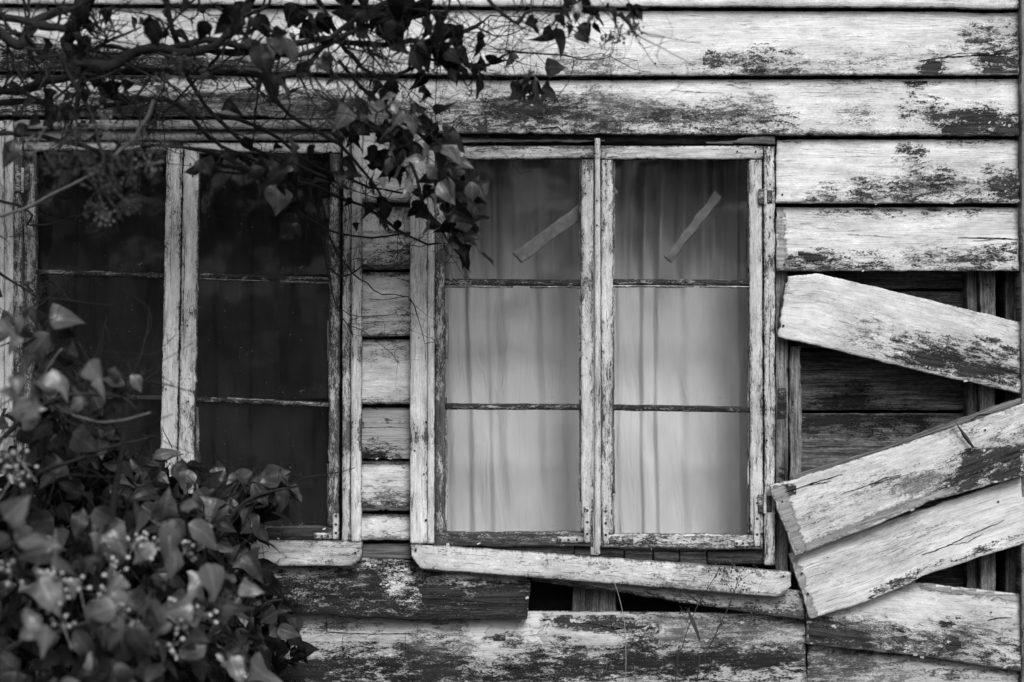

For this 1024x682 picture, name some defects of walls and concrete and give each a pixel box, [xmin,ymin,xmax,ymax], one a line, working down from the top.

peeling [703,43,806,86]
peeling [429,105,804,148]
peeling [804,19,1020,220]
peeling [783,247,895,272]
peeling [911,242,1018,270]
peeling [885,330,1021,392]
peeling [802,430,1024,550]
peeling [398,570,1021,678]